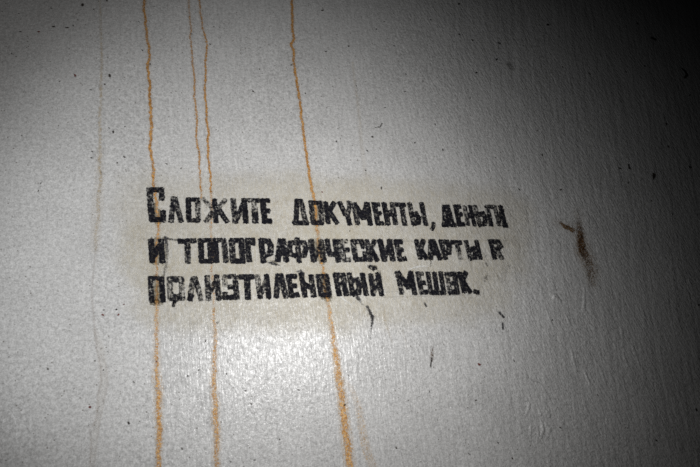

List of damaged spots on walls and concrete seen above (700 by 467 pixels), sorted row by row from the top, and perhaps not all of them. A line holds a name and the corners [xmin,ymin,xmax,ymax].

corrosion [143,0,159,245]
corrosion [188,0,212,206]
corrosion [290,0,319,240]
corrosion [559,216,594,283]
corrosion [154,261,163,467]
corrosion [211,324,219,467]
corrosion [319,255,353,467]